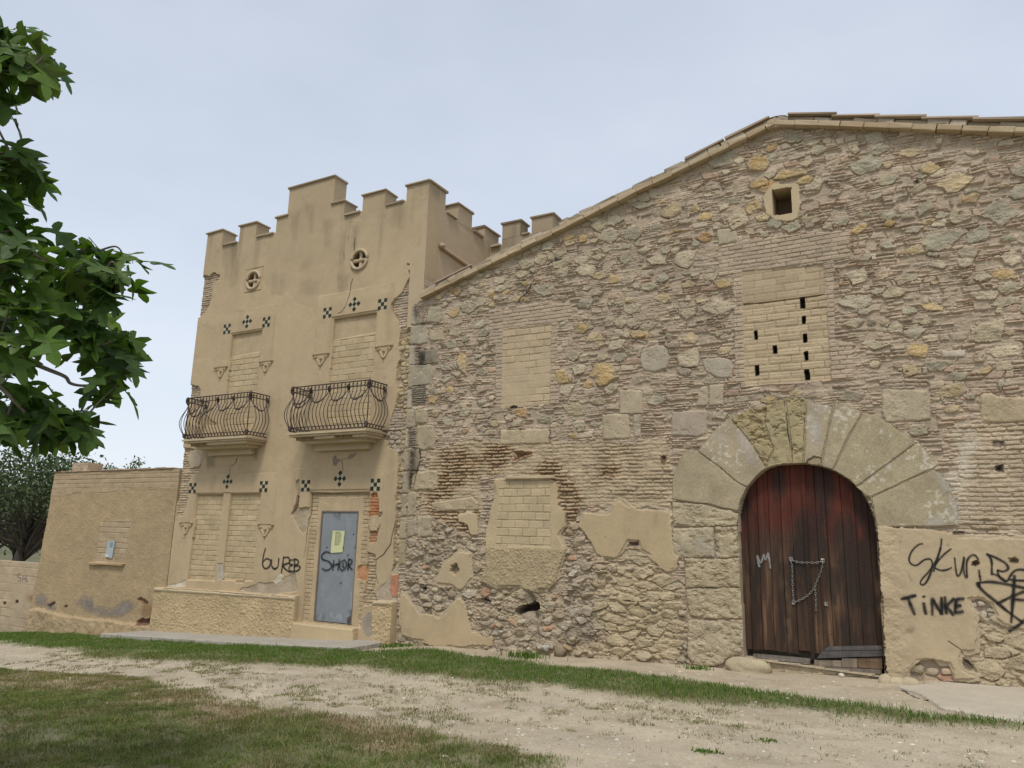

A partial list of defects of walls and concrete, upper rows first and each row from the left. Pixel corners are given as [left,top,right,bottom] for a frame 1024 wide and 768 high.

spalling [200,272,220,317]
spalling [358,283,679,648]
flaking render [877,524,1024,683]